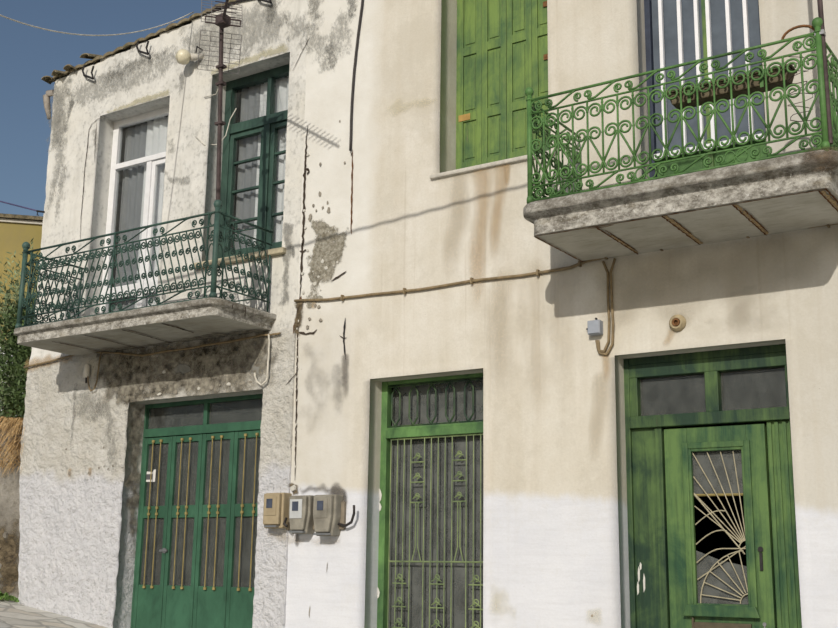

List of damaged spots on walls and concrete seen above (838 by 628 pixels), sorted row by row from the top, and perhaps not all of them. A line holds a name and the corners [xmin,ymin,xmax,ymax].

crack [288,126,317,494]
spalling [306,191,347,329]
crack [339,318,347,385]
damp [104,365,166,536]